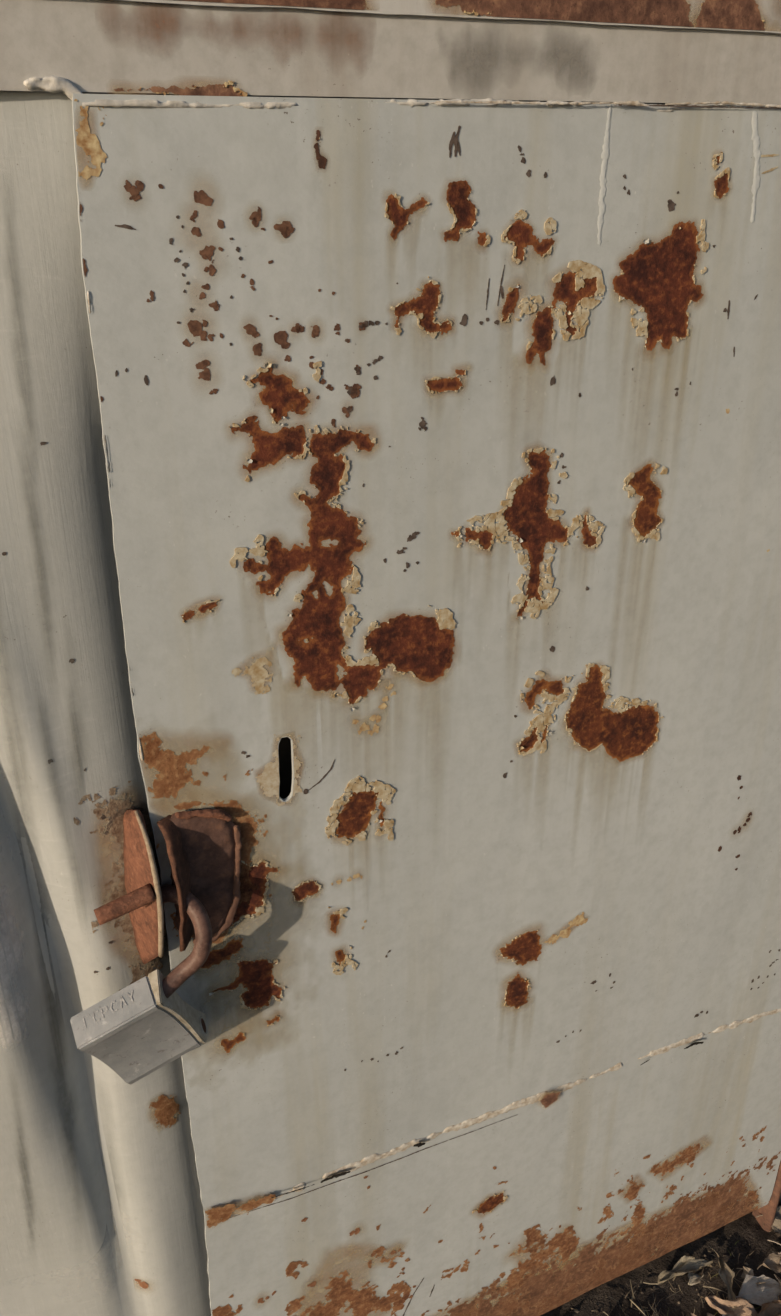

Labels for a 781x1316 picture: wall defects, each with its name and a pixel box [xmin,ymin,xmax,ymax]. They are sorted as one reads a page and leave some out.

rust [443,180,557,264]
rust [391,276,454,338]
rust [500,219,709,366]
rust [229,361,457,711]
rust [451,447,605,620]
rust [623,463,668,543]
rust [517,663,664,762]
rust [325,776,396,846]
rust [73,732,286,1026]
rust [499,930,542,1009]
rust [284,1225,411,1316]
rust [421,1126,781,1316]